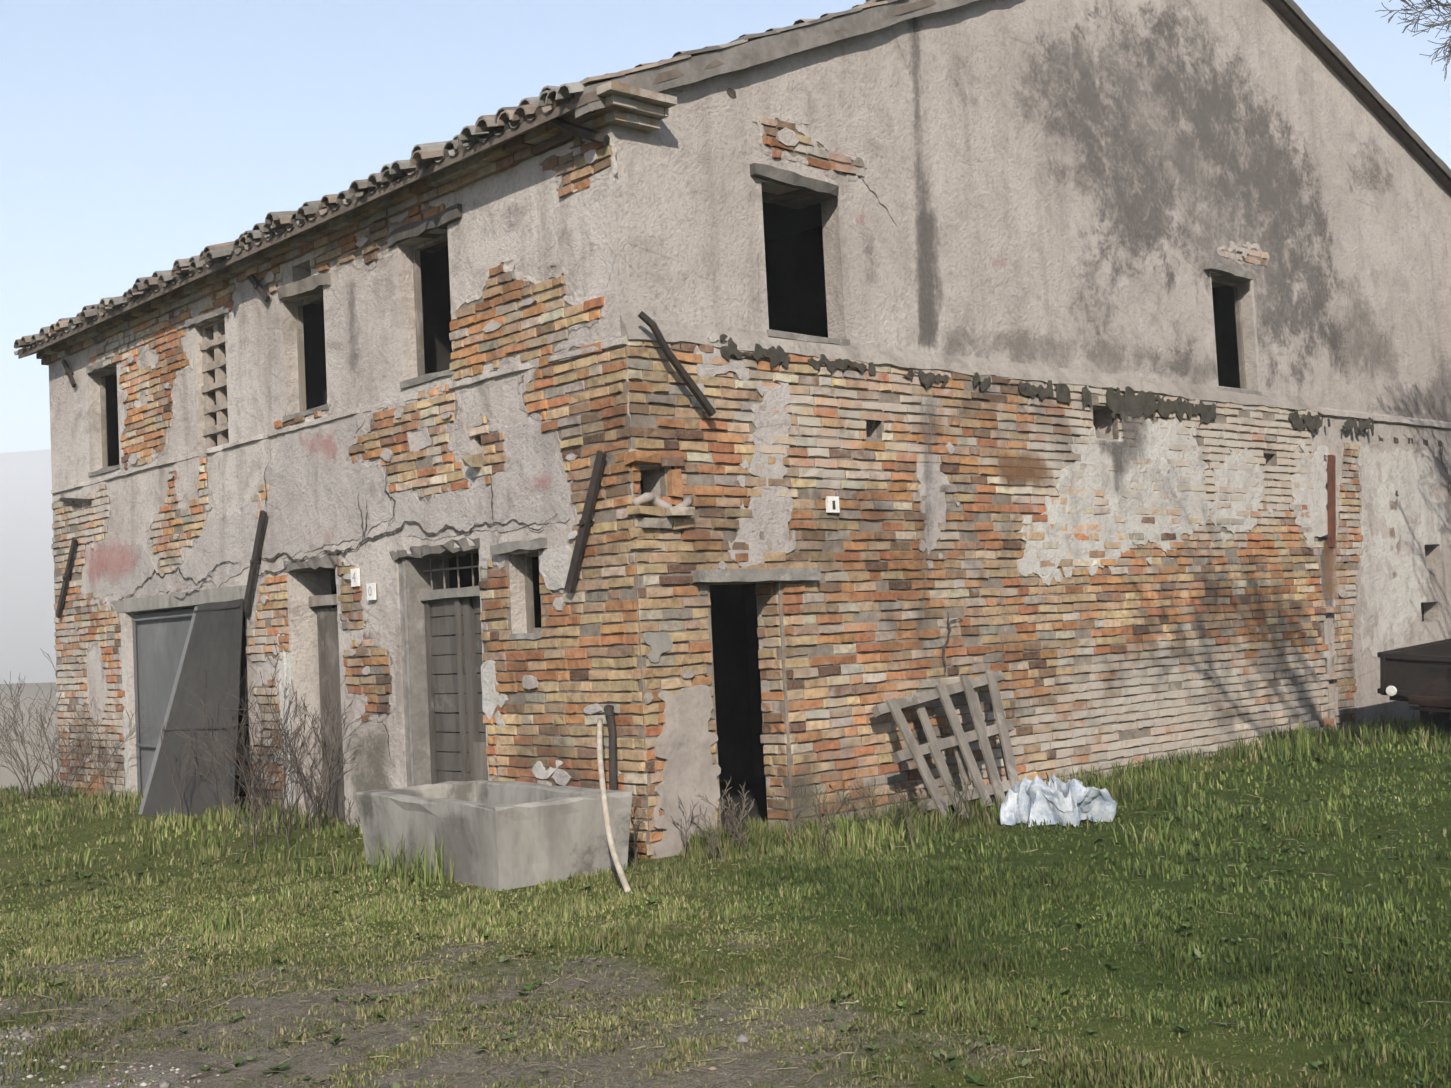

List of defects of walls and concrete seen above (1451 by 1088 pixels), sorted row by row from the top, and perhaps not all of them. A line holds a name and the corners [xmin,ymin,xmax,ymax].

spalling [532,137,618,198]
spalling [752,113,868,182]
water stain [917,158,940,344]
water stain [1021,16,1337,348]
crack [119,460,558,600]
spalling [51,255,653,859]
flaking render [693,332,796,569]
flaking render [915,442,960,569]
flaking render [1017,417,1446,730]